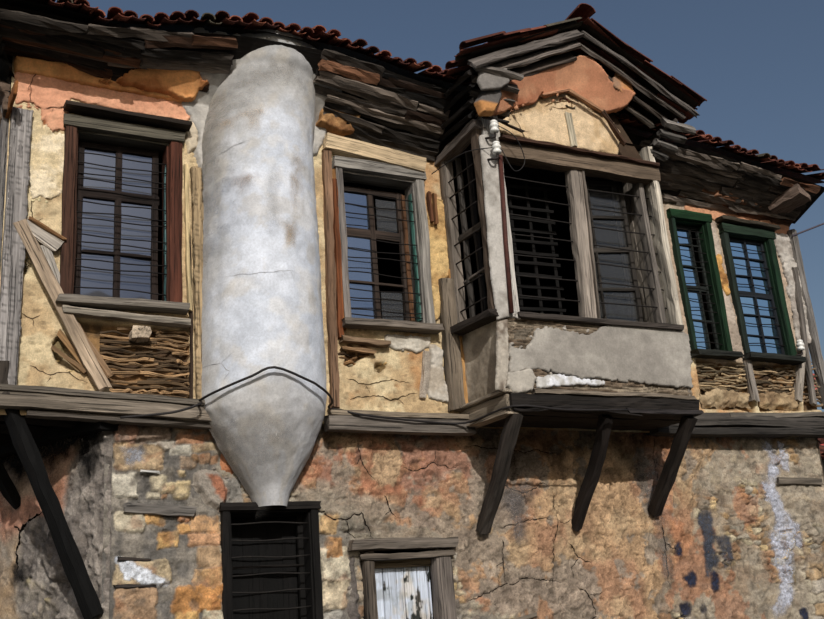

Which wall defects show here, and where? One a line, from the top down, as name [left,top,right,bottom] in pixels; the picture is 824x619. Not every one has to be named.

flaking render [488,55,636,117]
flaking render [14,68,209,203]
flaking render [315,108,360,137]
crack [32,366,85,383]
crack [346,378,416,403]
flaking render [384,334,449,403]
flaking render [506,324,693,393]
leakage [79,435,99,475]
leakage [778,442,789,470]
crack [14,512,42,569]
crack [318,511,371,538]
crack [468,483,602,619]